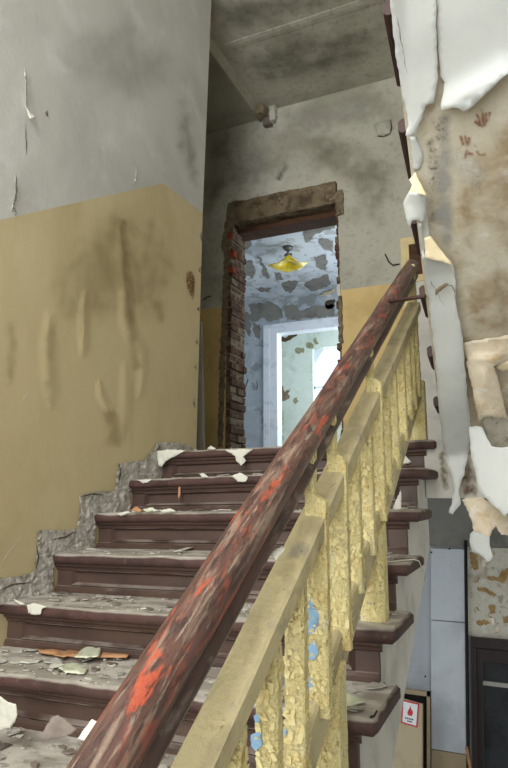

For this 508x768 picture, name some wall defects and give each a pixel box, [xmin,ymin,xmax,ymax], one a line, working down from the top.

spalling [207,200,344,482]
spalling [335,189,344,216]
peeling [390,0,508,632]
spalling [0,442,193,615]